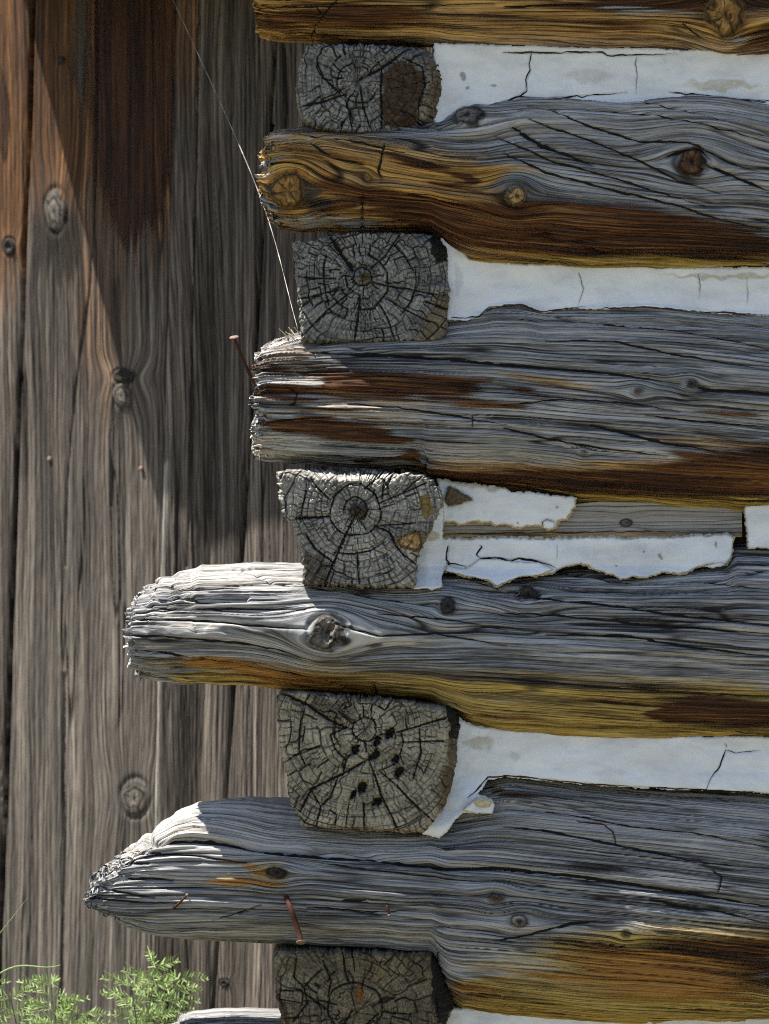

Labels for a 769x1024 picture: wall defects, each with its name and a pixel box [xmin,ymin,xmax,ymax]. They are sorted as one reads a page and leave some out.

crack [503,51,671,101]
crack [441,519,732,588]
flaking render [443,497,735,588]
crack [467,745,767,798]